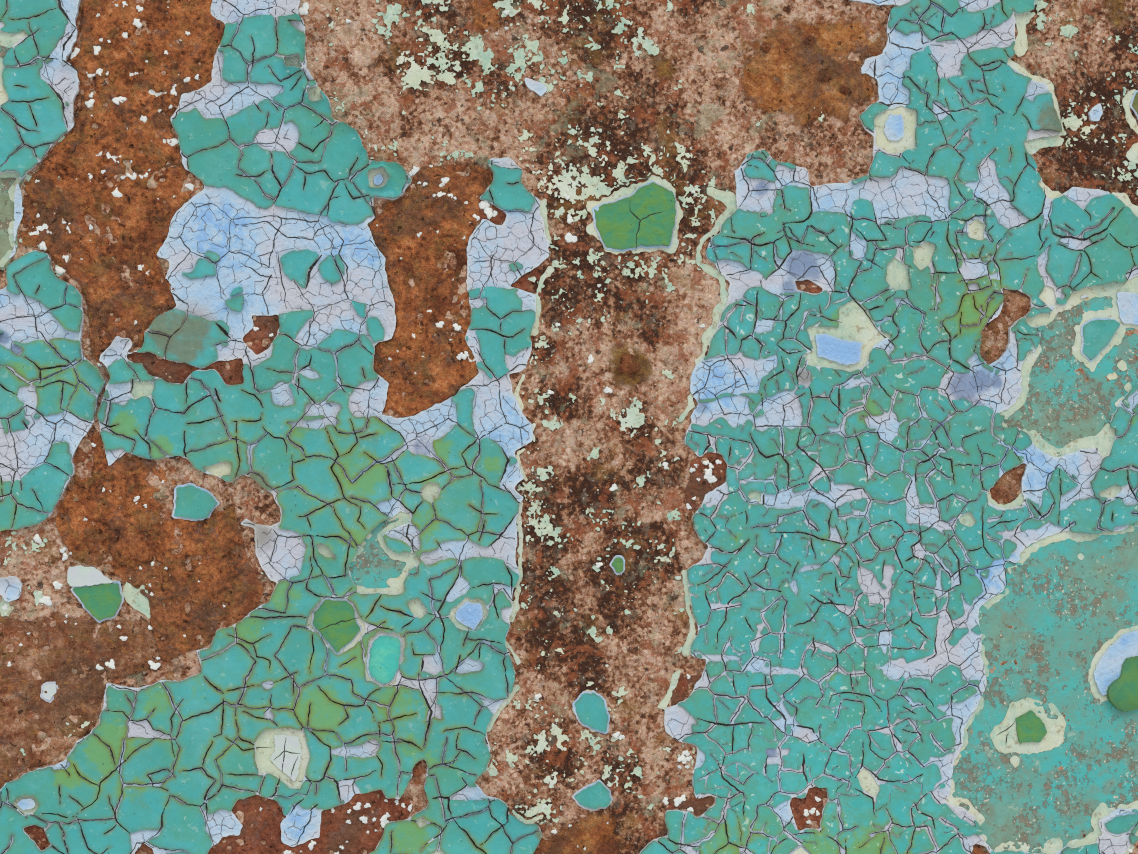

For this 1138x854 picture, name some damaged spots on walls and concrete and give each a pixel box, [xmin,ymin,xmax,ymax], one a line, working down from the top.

corrosion [19,0,280,385]
crack [0,0,550,854]
peeling [0,0,554,854]
corrosion [370,165,506,417]
peeling [586,175,683,255]
crack [630,210,661,248]
peeling [639,0,1138,854]
crack [658,0,1138,854]
corrosion [0,428,264,789]
corrosion [208,790,413,854]
peeling [572,690,610,734]
corrosion [790,787,827,831]